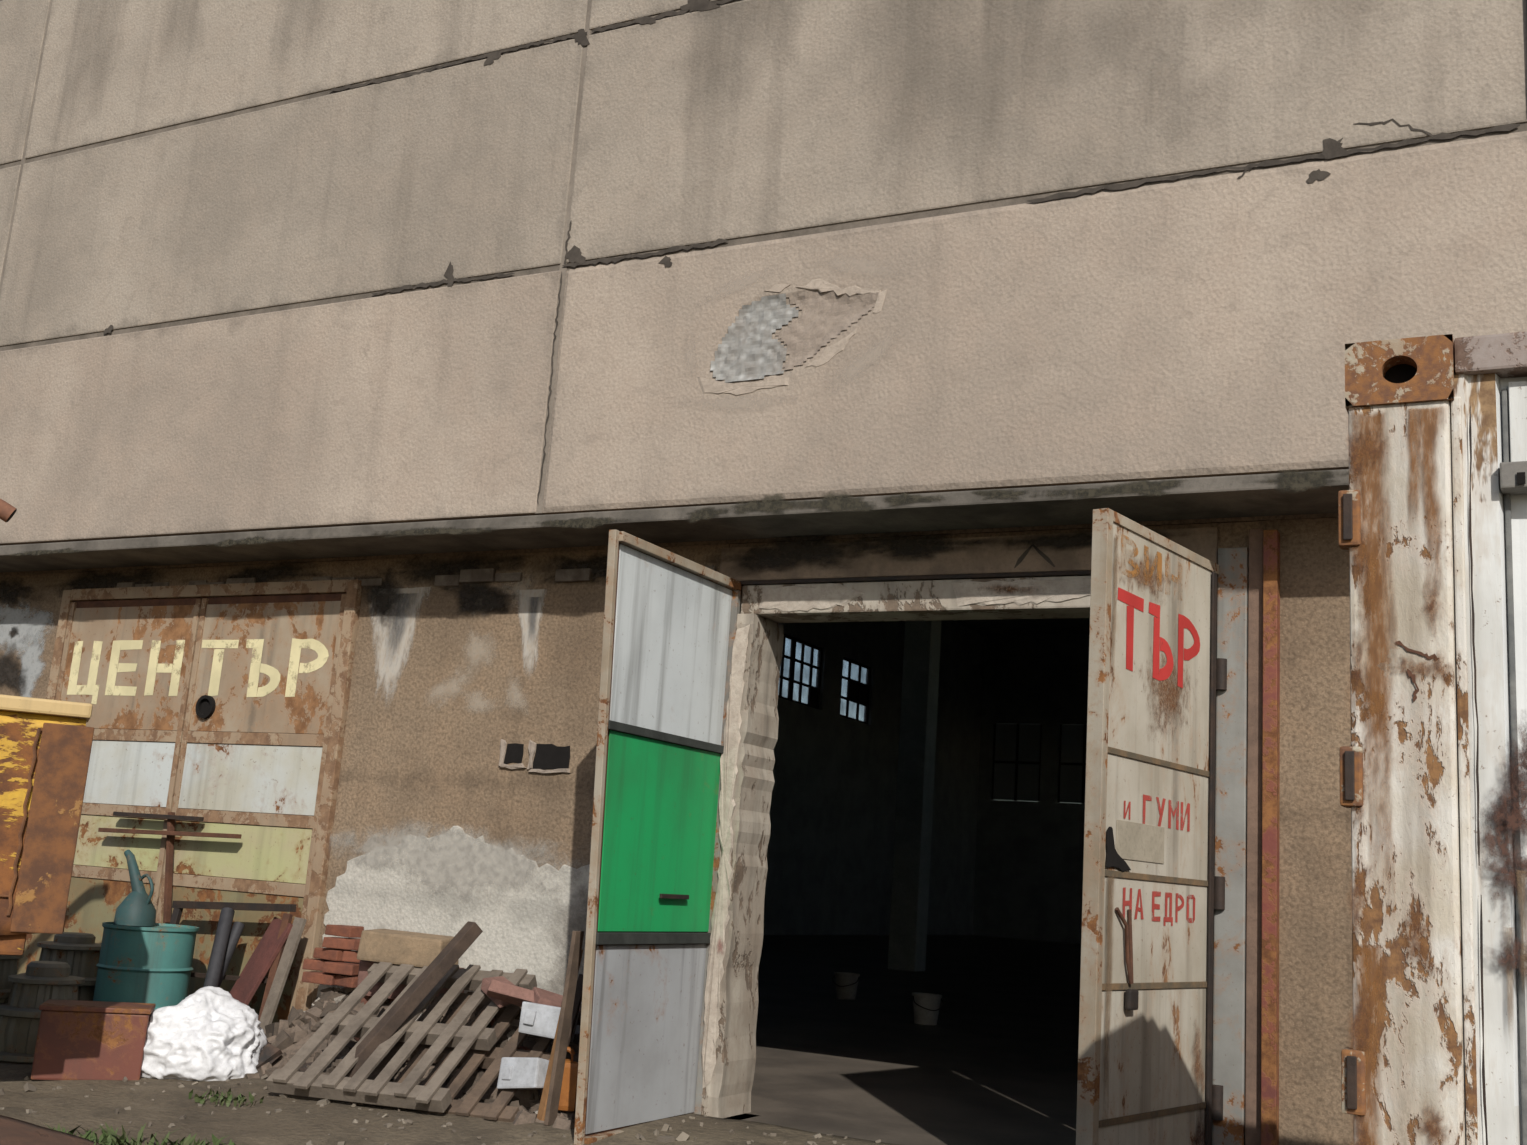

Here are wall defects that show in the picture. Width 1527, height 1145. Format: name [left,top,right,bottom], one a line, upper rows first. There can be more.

crack [1028,119,1520,203]
spalling [686,258,889,409]
leakage [371,587,430,692]
leakage [503,578,545,669]
corrosion [1349,408,1448,816]
peeling [322,826,590,1034]
corrosion [1407,916,1424,955]
corrosion [1482,726,1527,1020]
corrosion [1350,946,1382,1145]
corrosion [1423,1113,1443,1140]